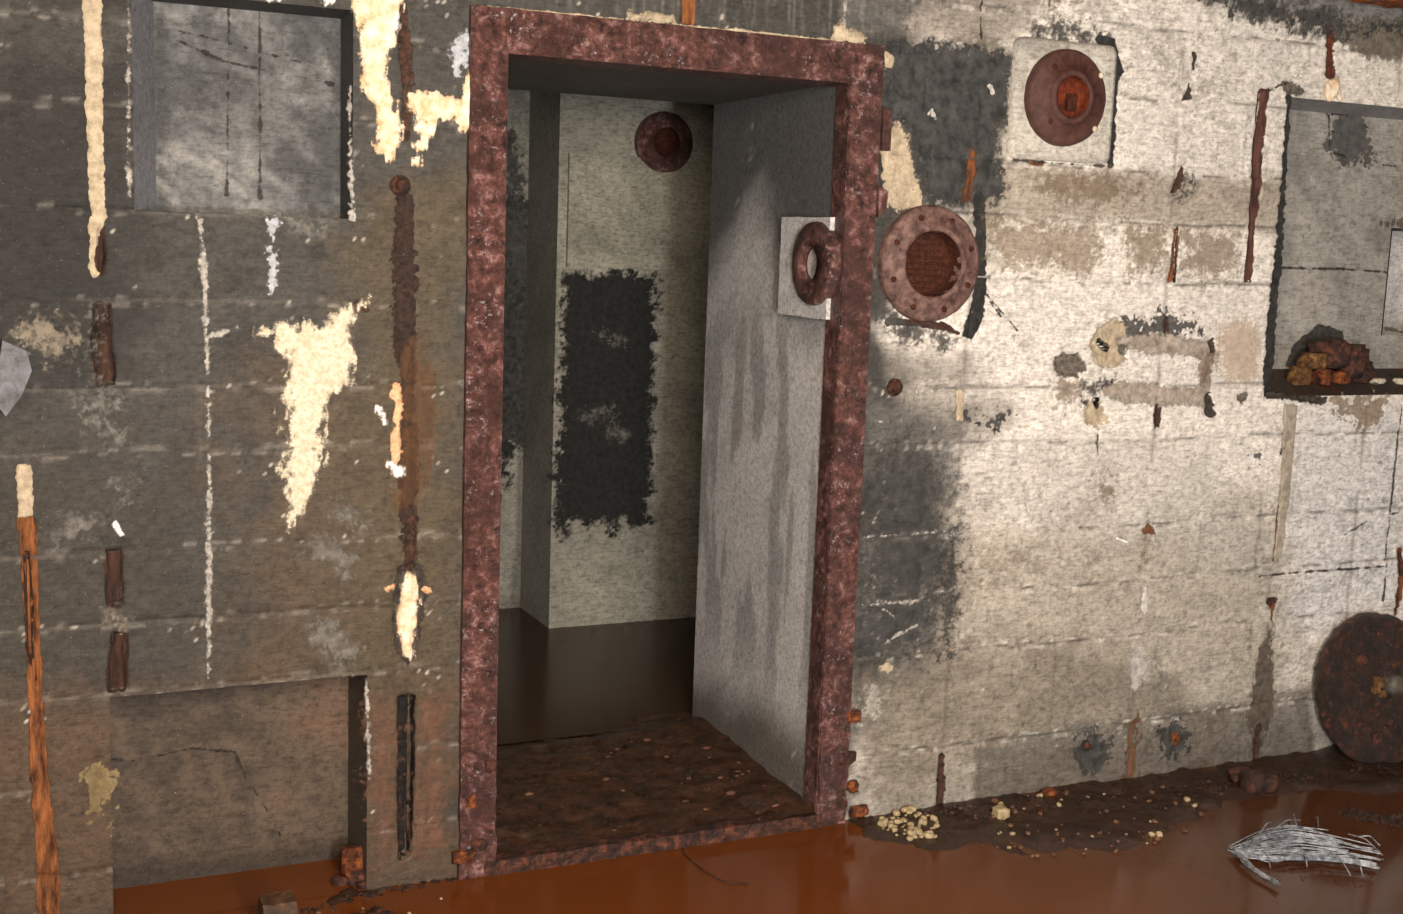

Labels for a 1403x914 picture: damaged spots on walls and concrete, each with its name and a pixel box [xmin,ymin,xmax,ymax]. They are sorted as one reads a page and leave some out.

damp [324,0,470,166]
corrosion [1323,26,1342,102]
damp [935,526,966,662]
corrosion [1394,547,1403,616]
corrosion [847,709,861,723]
corrosion [834,751,869,818]
corrosion [451,838,493,873]